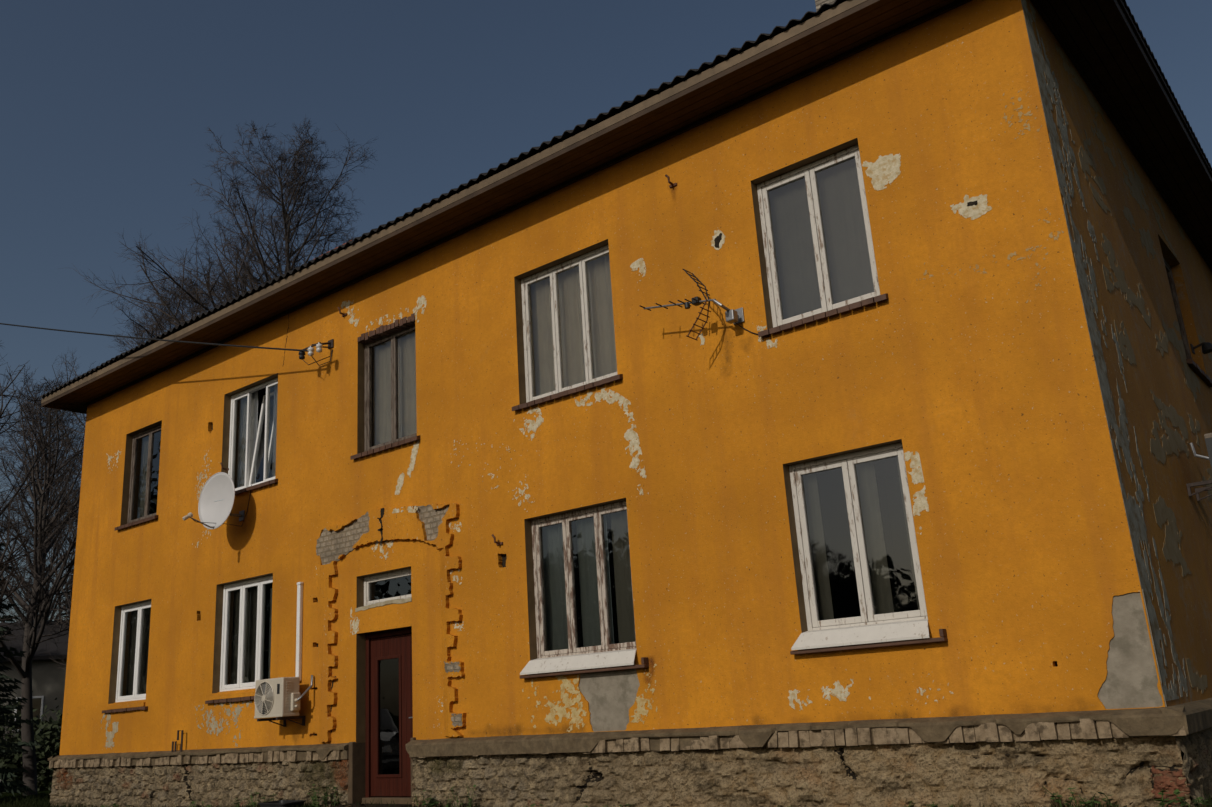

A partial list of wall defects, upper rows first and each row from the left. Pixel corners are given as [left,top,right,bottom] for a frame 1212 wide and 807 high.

peeling [862,153,901,191]
peeling [919,0,1188,709]
peeling [574,388,649,495]
spalling [392,440,462,541]
peeling [904,451,929,535]
spalling [315,512,394,575]
crack [376,508,385,543]
spalling [522,664,658,732]
peeling [788,678,854,711]
crack [182,764,193,803]
crack [574,762,602,801]
crack [834,745,846,766]